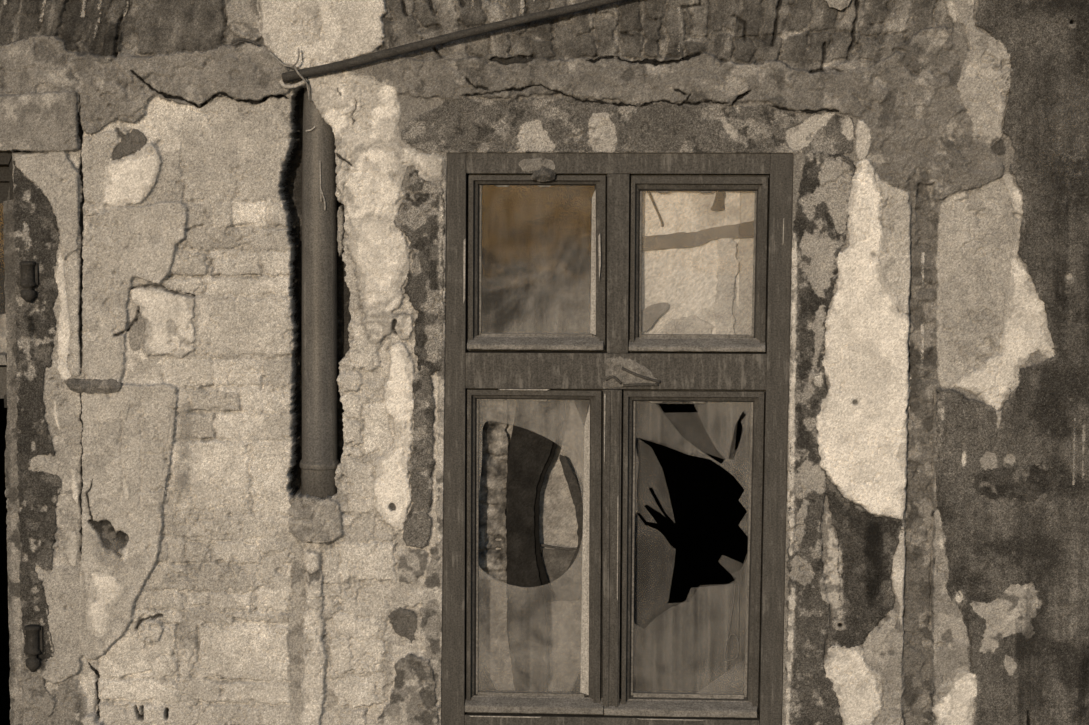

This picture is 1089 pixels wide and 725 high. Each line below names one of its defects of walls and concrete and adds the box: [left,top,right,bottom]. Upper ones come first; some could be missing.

crack [131,70,289,108]
crack [464,55,751,107]
crack [587,53,701,66]
crack [772,105,839,113]
peeling [86,129,161,216]
peeling [129,286,195,358]
spalling [935,174,1055,428]
peeling [962,452,1049,505]
leakage [1072,418,1086,485]
spalling [89,519,129,561]
flaking render [931,508,1042,725]
crack [88,662,100,716]